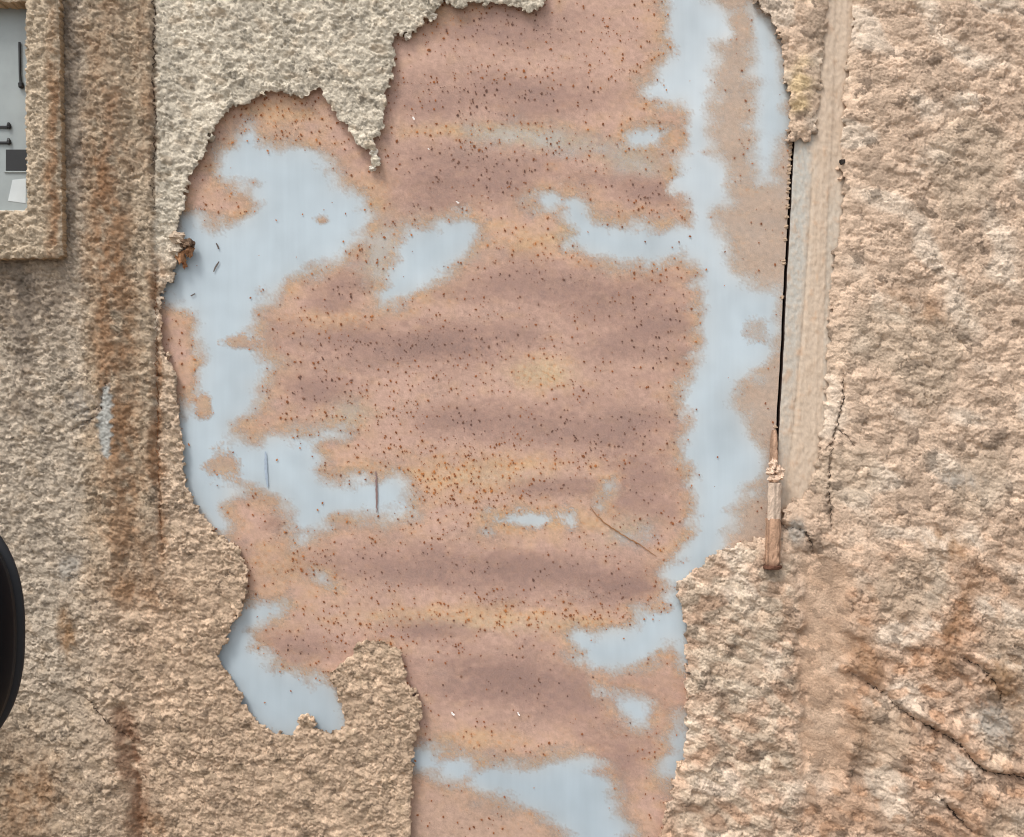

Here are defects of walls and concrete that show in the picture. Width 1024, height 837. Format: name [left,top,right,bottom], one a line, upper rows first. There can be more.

spalling [392,1,545,42]
spalling [752,0,795,143]
rust [710,0,792,316]
spalling [159,87,326,412]
rust [159,302,214,419]
rust [184,0,707,837]
rust [735,340,781,449]
crack [818,373,854,521]
rust [727,482,768,548]
spalling [297,713,345,734]
crack [849,671,1024,779]